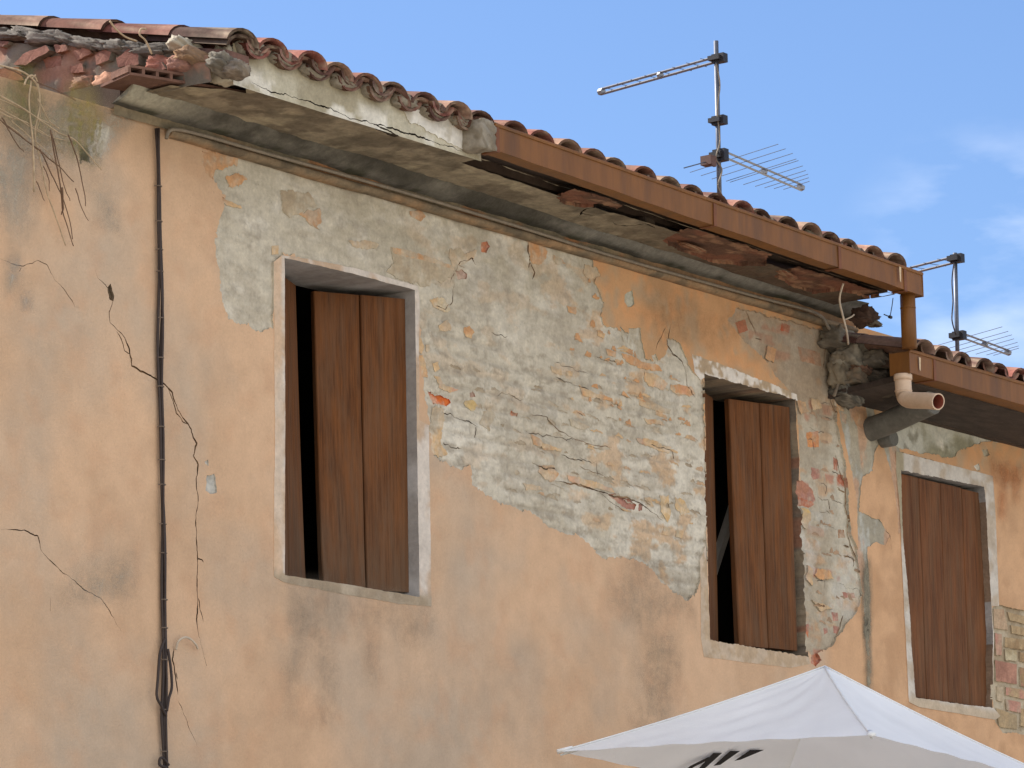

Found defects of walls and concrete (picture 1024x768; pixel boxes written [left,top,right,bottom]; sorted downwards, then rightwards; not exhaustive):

crack [254,83,459,151]
crack [4,260,74,304]
flaking render [202,151,708,601]
crack [97,276,207,666]
flaking render [728,307,999,666]
crack [1,529,118,626]
crack [167,650,197,744]
damp [862,566,872,688]
flaking render [990,605,1024,735]